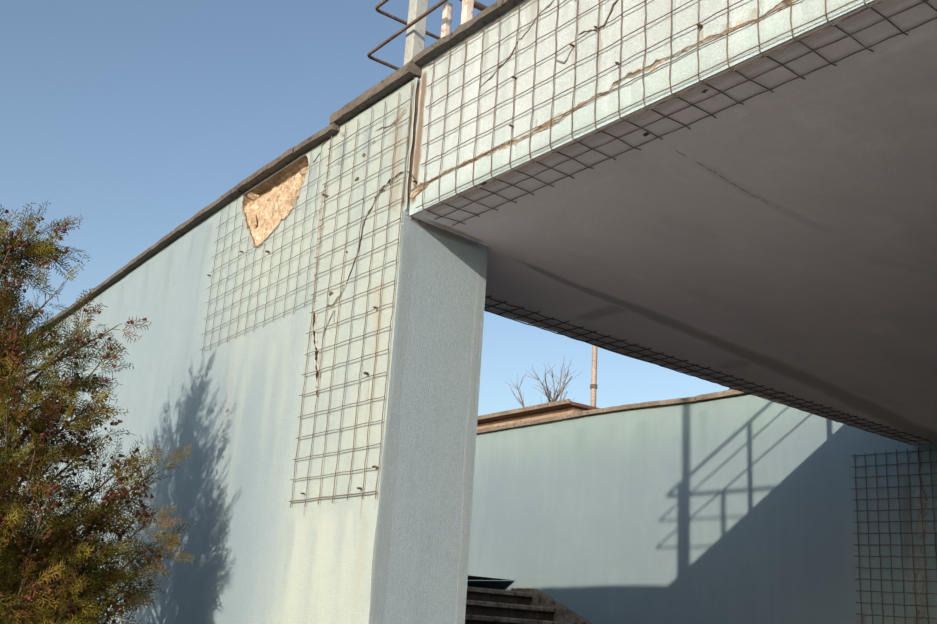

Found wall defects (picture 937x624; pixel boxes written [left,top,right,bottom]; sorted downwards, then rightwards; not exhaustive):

crack [313,0,795,397]
spalling [199,0,937,508]